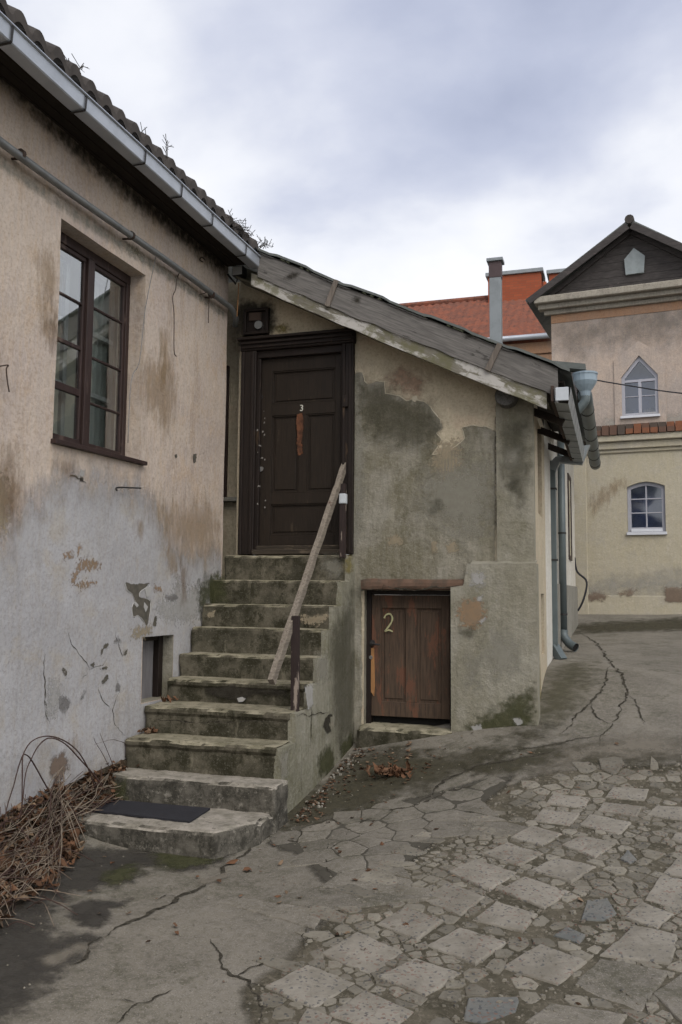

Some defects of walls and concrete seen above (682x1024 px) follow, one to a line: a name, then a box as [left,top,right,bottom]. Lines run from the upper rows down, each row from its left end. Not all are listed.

peeling [63,546,102,589]
peeling [350,372,496,743]
spalling [91,582,178,691]
crack [74,939,95,964]